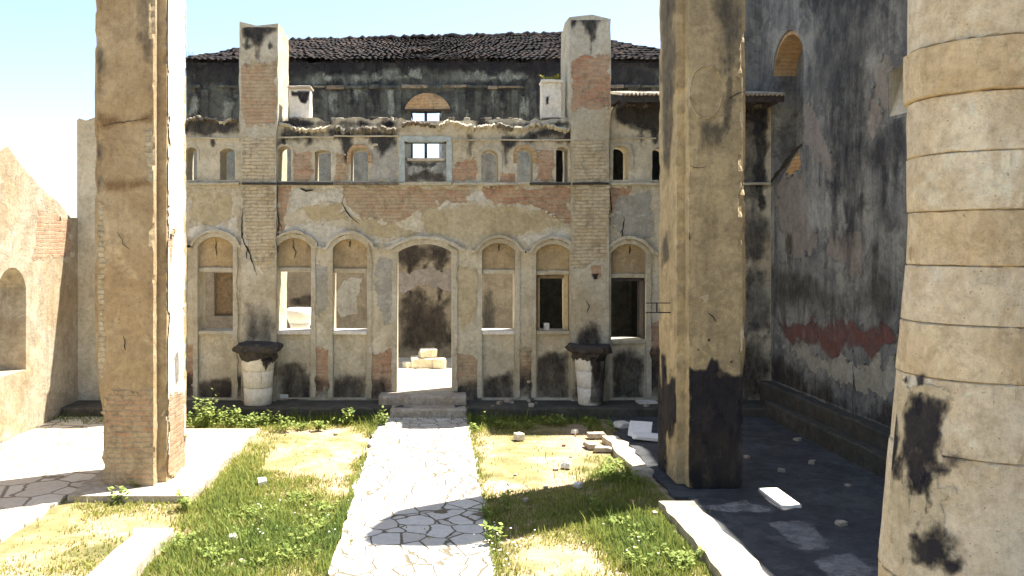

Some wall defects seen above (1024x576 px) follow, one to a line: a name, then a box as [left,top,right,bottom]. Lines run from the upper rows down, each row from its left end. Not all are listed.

damp [806,0,888,232]
crack [241,188,313,275]
peeling [168,0,655,479]
damp [742,107,847,408]
damp [457,352,578,400]
damp [578,325,599,344]
damp [604,349,675,467]
damp [690,435,743,487]
flaking render [778,316,957,568]
damp [869,403,893,427]